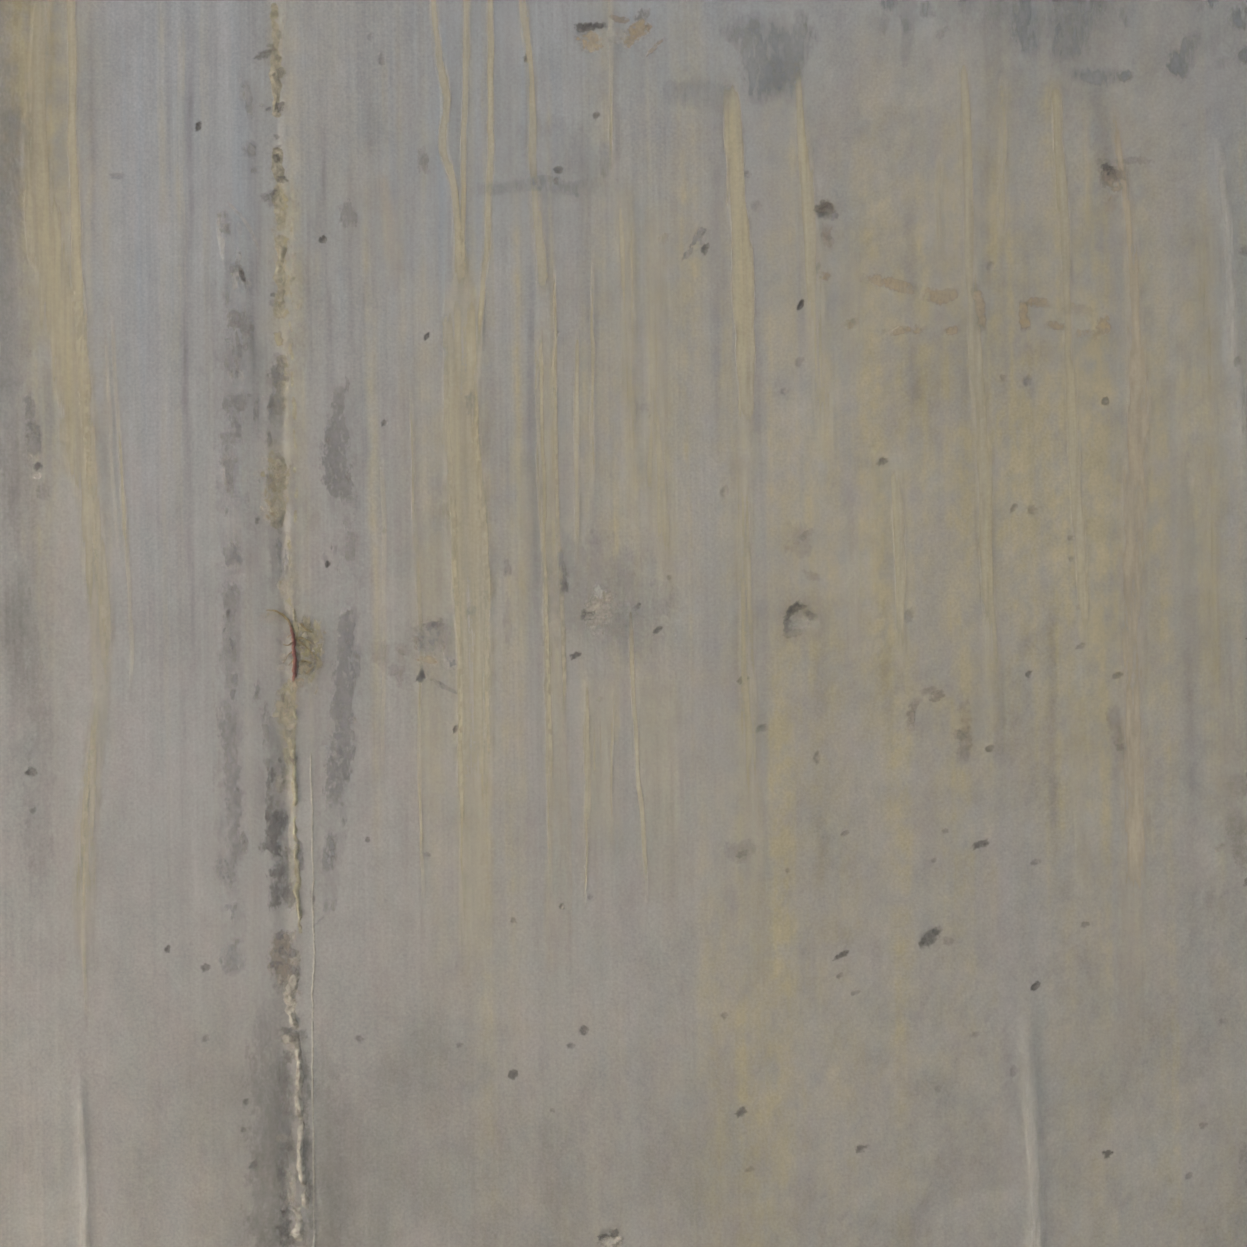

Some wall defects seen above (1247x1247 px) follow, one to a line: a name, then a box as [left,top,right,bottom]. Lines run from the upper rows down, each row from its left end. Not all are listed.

spalling [574,9,663,57]
leakage [24,24,107,637]
crack [253,398,274,446]
leakage [322,389,353,500]
leakage [724,88,755,410]
leakage [326,611,356,800]